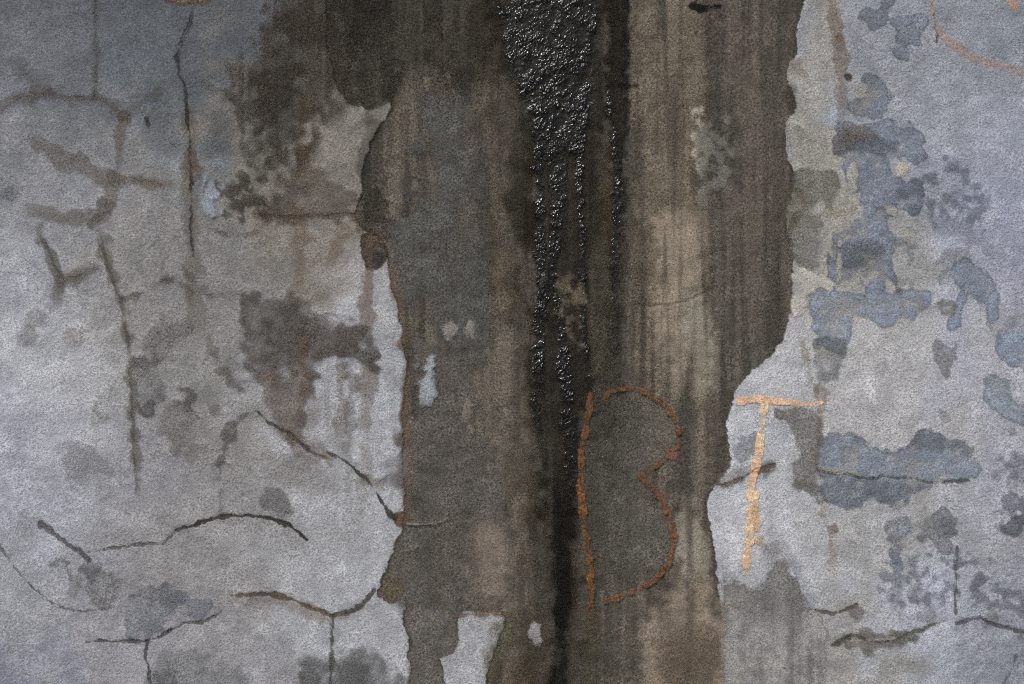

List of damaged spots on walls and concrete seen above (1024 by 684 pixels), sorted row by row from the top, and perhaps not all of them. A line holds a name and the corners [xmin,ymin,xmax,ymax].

crack [174,12,194,257]
damp [229,0,735,684]
crack [218,411,441,528]
crack [0,547,89,613]
crack [38,514,308,563]
crack [86,588,376,684]